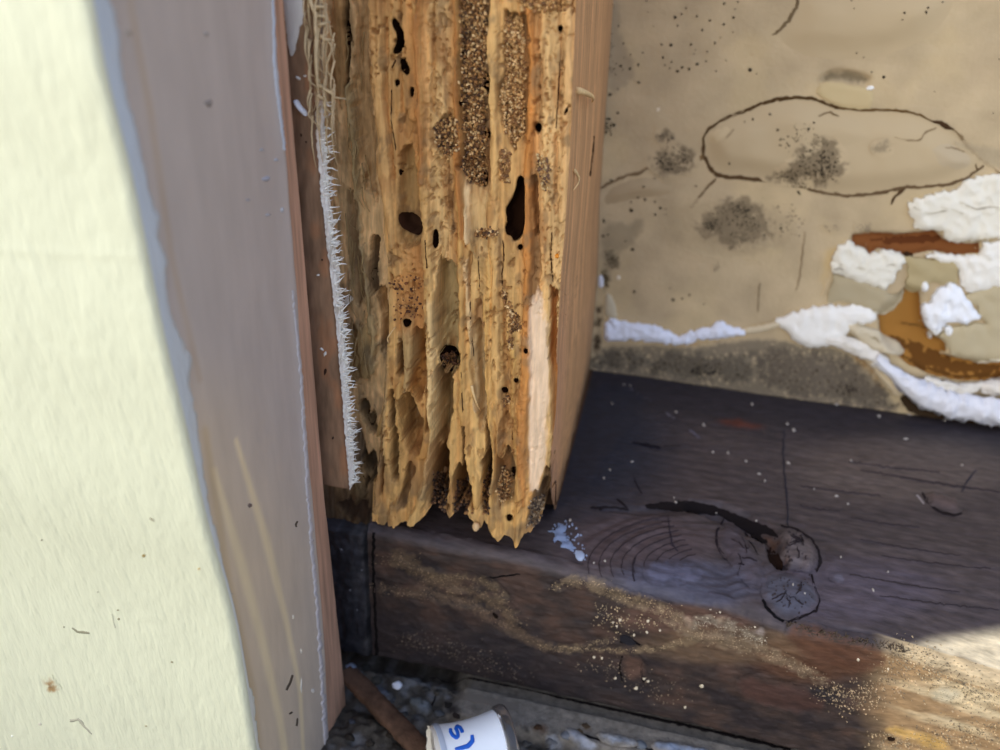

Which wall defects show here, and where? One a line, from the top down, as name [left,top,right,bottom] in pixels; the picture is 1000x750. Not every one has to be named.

crack [772,0,799,35]
water stain [598,122,852,297]
crack [690,95,1000,214]
peeling [590,173,1000,427]
water stain [545,337,906,561]